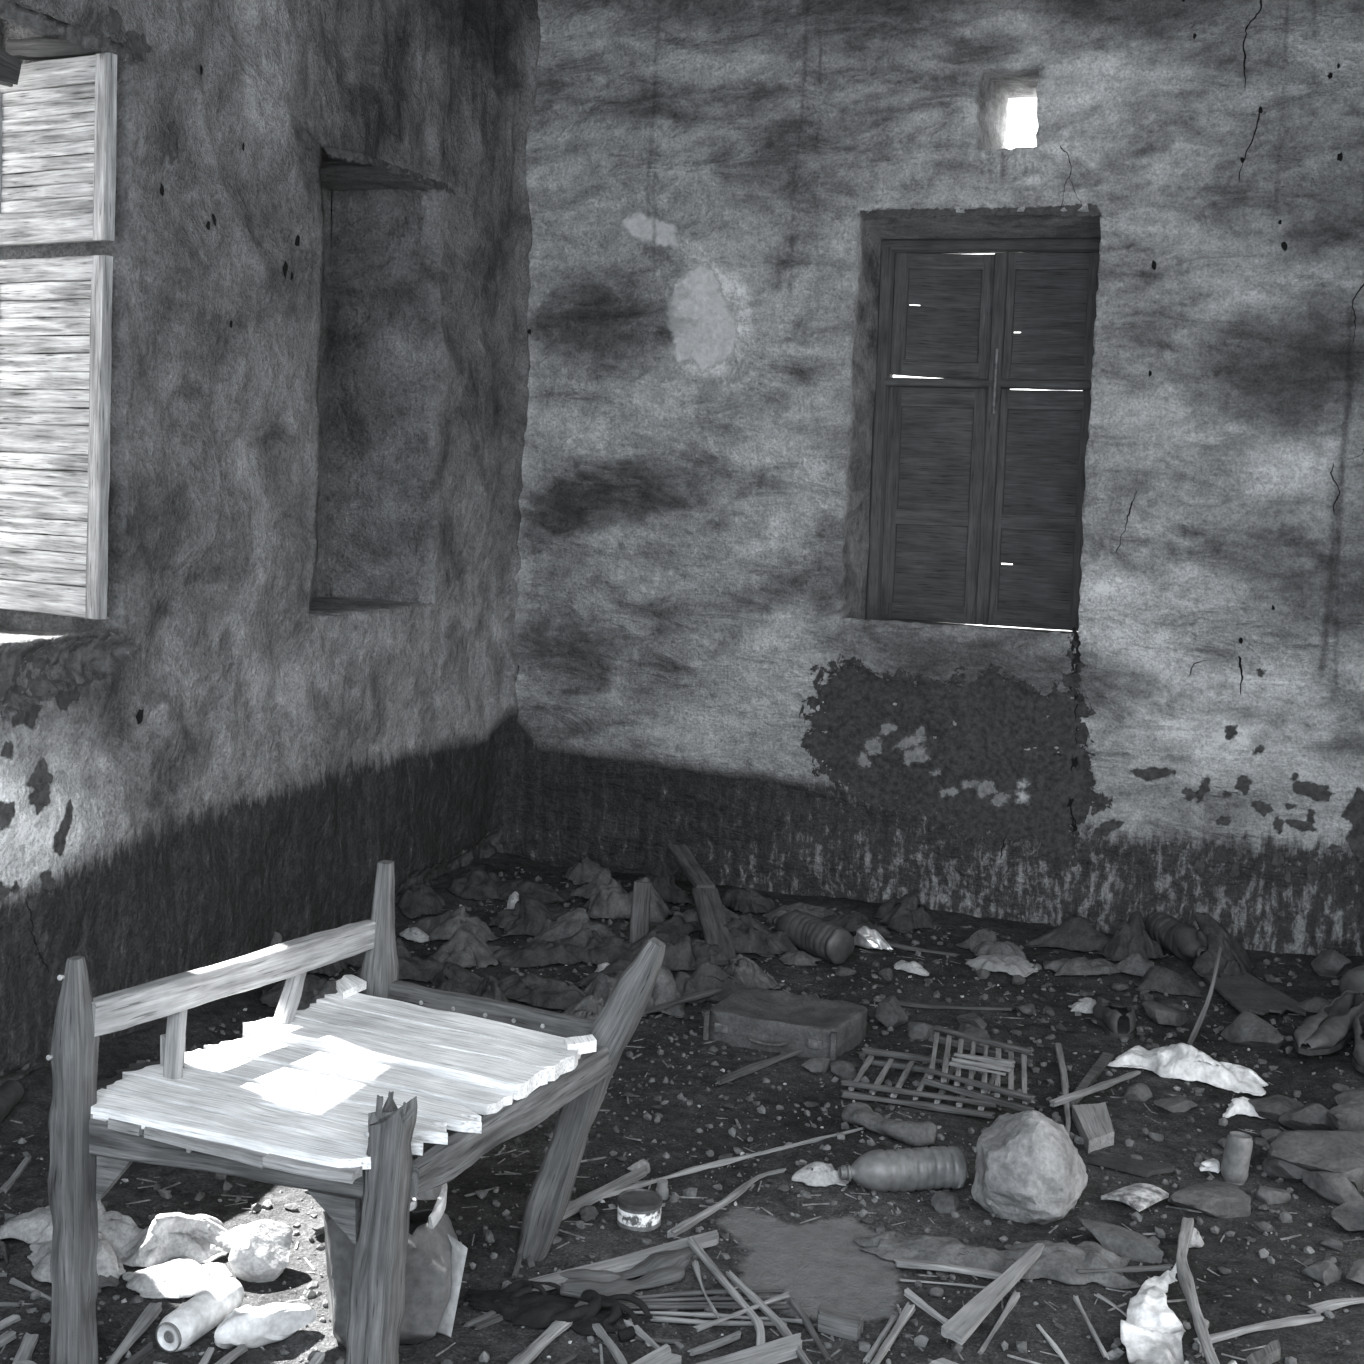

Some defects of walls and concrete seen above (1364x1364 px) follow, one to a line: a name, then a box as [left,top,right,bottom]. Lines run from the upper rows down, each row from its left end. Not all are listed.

crack [1239,0,1262,182]
crack [1351,284,1364,342]
crack [1330,449,1364,514]
spalling [0,628,141,759]
spalling [0,758,53,830]
spalling [53,799,73,856]
spalling [798,629,1124,869]
flaking render [1130,766,1176,781]
flaking render [1224,725,1238,740]
flaking render [1182,773,1335,834]
flaking render [1328,787,1364,861]
spalling [0,881,20,900]